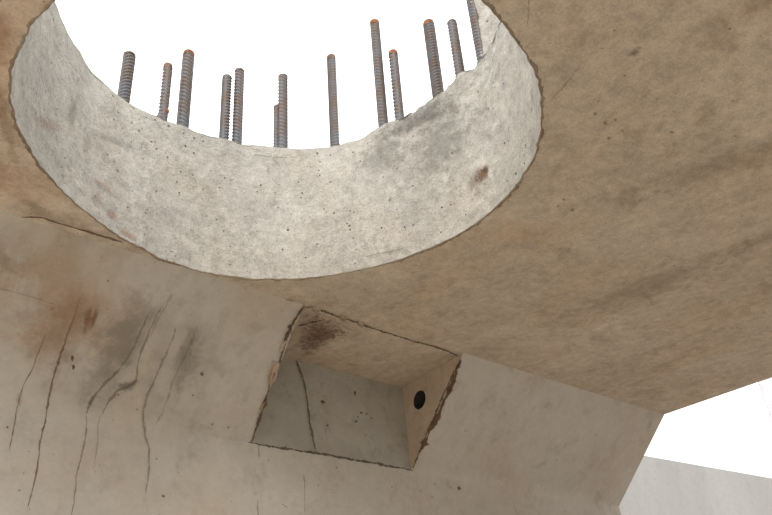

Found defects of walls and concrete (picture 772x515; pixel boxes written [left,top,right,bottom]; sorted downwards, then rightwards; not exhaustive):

crack [10,336,45,445]
crack [28,301,97,506]